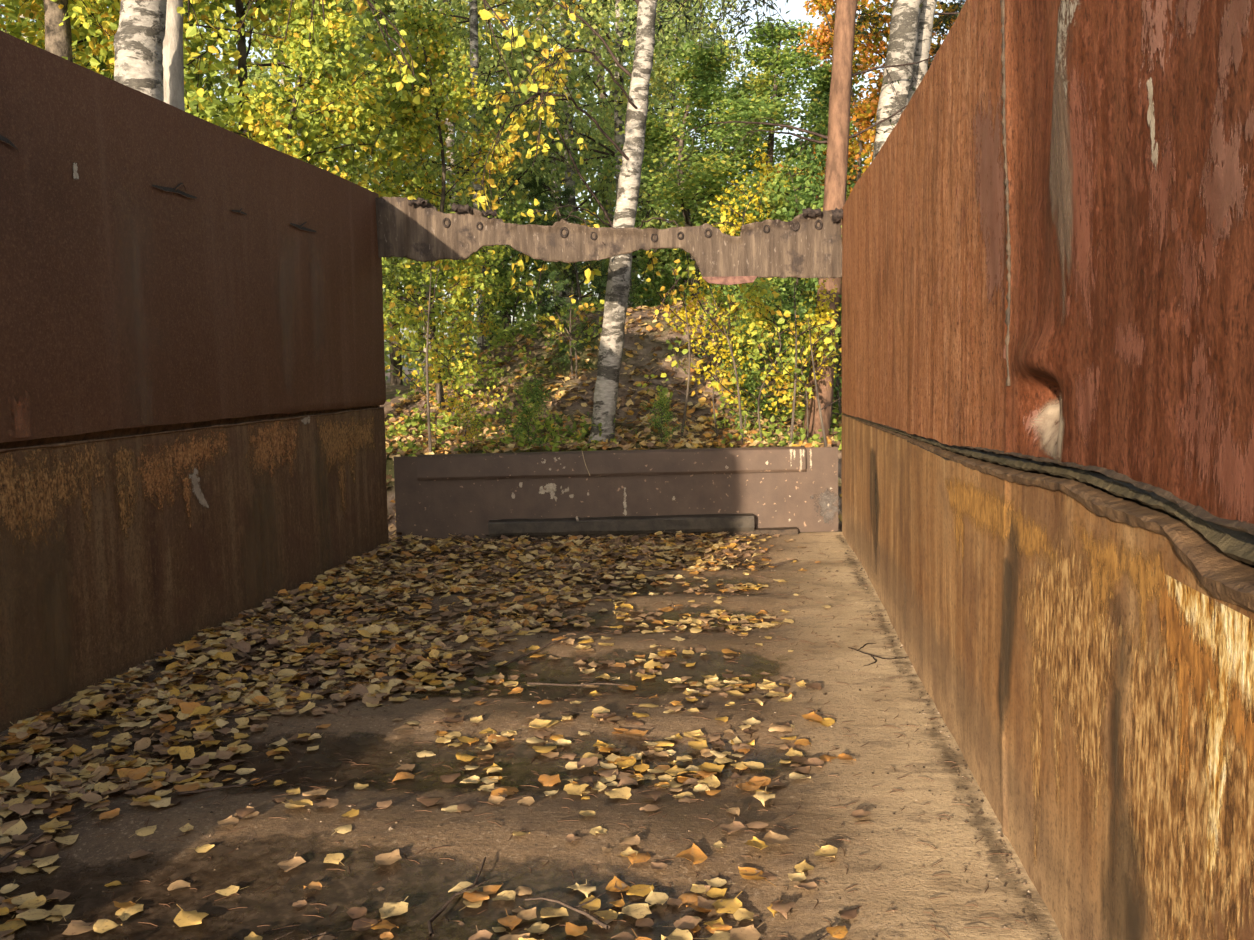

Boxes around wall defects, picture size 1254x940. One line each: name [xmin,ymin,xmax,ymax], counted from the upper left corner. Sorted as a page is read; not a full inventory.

peeling [1056,40,1100,331]
peeling [1135,0,1254,523]
rust [0,395,228,557]
rust [246,420,298,483]
rust [316,415,376,513]
peeling [1075,363,1101,445]
peeling [1113,322,1145,368]
rust [945,478,1254,940]